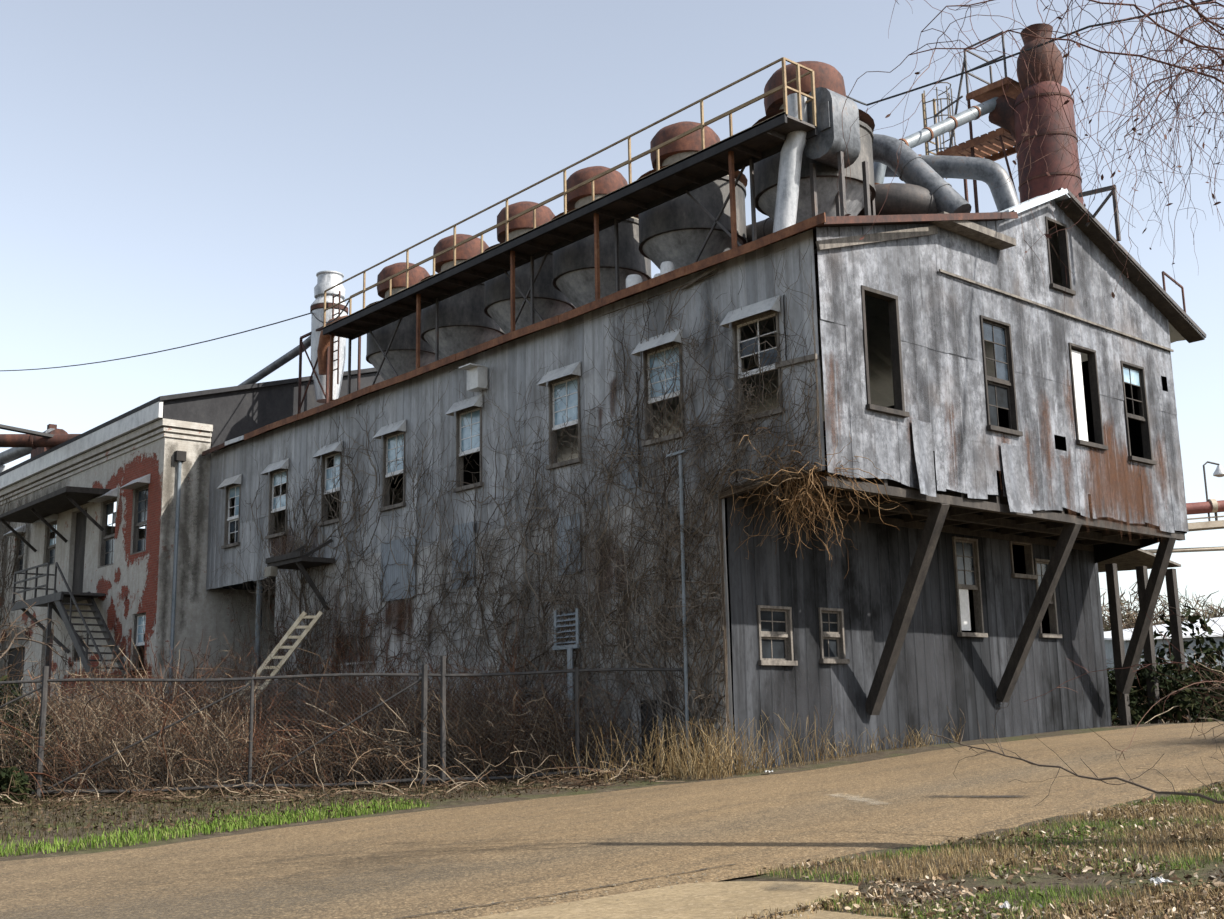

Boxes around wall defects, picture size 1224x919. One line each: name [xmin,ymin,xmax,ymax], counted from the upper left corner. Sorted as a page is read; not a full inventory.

peeling [51,451,163,698]